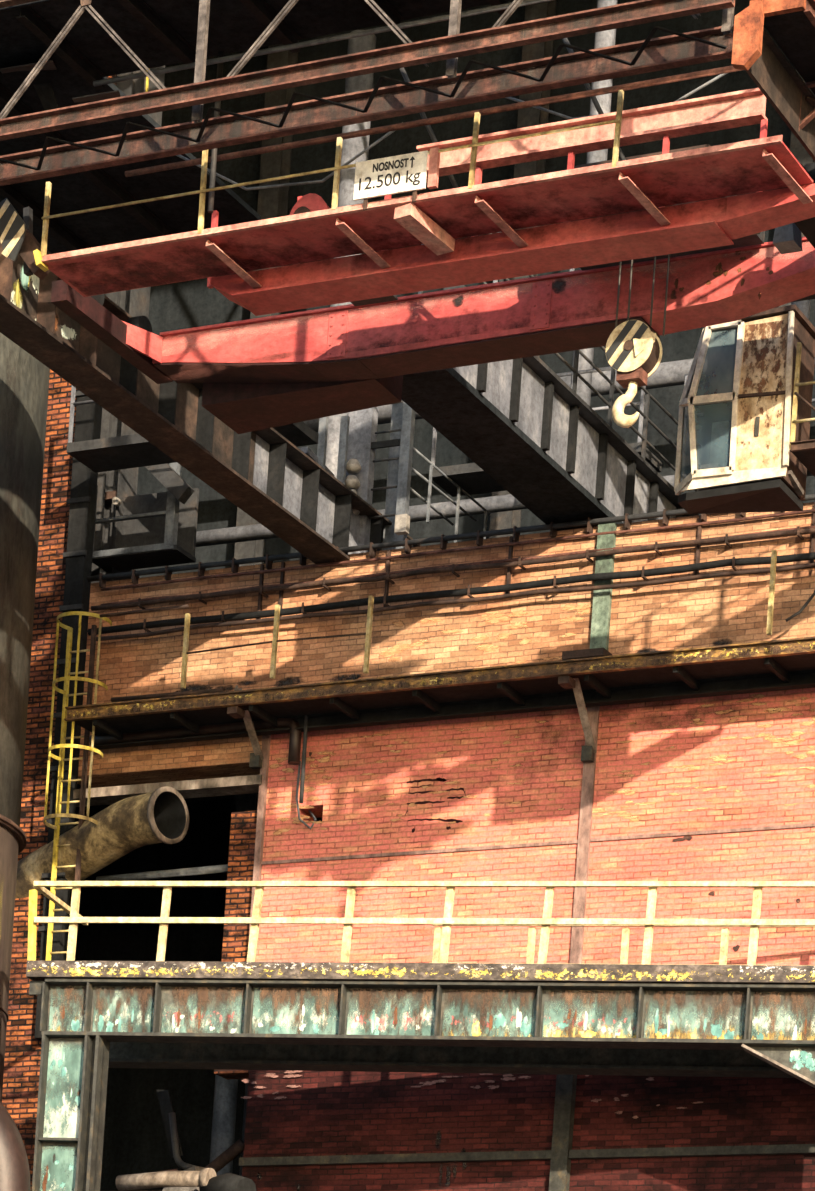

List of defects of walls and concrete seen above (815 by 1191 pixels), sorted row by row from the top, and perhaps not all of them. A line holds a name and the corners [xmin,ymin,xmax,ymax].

corrosion [739,320,788,427]
crack [405,777,466,833]
peeling [27,961,815,1071]
peeling [40,1045,84,1191]